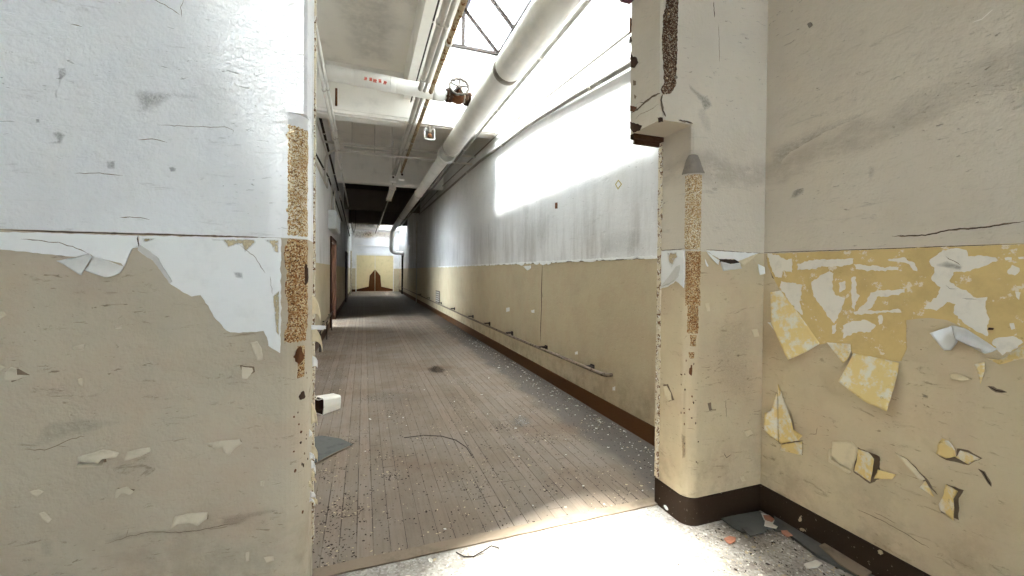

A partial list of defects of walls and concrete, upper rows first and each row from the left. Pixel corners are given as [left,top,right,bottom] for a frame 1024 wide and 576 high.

spalling [629,16,642,133]
crack [631,93,693,124]
peeling [0,124,326,379]
peeling [438,154,1024,361]
crack [706,221,1024,279]
peeling [75,447,151,468]